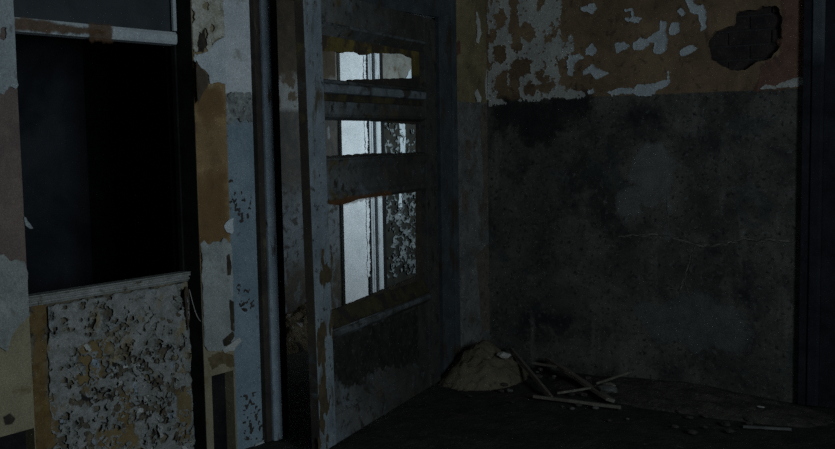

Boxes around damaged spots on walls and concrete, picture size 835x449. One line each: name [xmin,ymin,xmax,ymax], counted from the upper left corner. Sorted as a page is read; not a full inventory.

peeling [0,0,18,94]
peeling [191,0,253,125]
peeling [456,0,609,107]
peeling [607,71,670,97]
peeling [615,0,707,54]
peeling [680,45,697,56]
flaking render [708,0,804,91]
peeling [0,254,30,351]
peeling [200,191,255,369]
peeling [319,249,333,288]
peeling [47,282,195,449]
peeling [317,313,334,449]